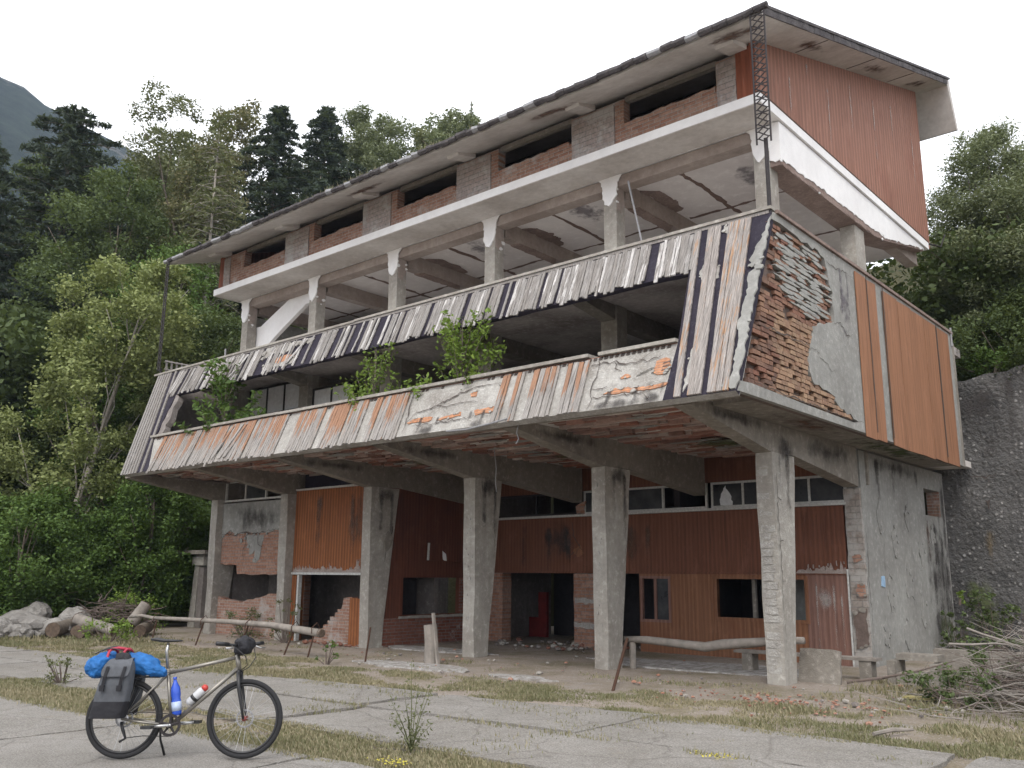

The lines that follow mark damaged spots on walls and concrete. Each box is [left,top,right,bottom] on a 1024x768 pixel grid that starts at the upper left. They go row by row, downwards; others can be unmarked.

spalling [721,215,852,420]
crack [404,383,501,427]
crack [587,351,662,408]
spalling [548,406,755,458]
spalling [852,583,870,649]